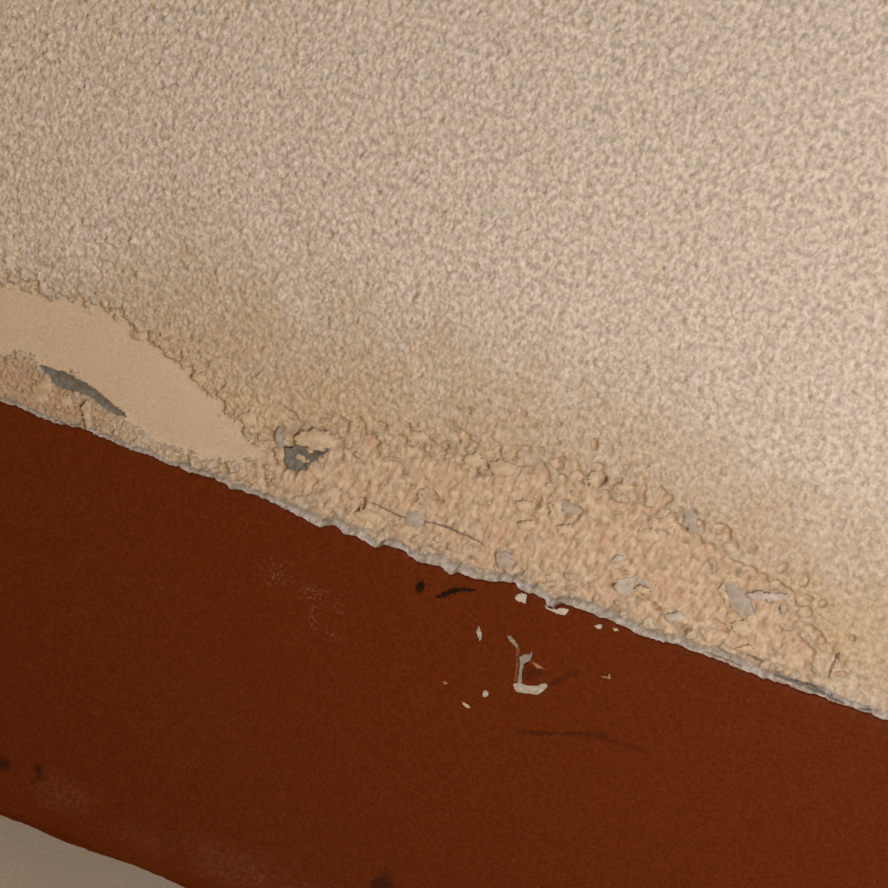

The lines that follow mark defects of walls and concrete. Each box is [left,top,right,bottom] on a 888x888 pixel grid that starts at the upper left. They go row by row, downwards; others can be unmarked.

spalling [0,272,847,695]